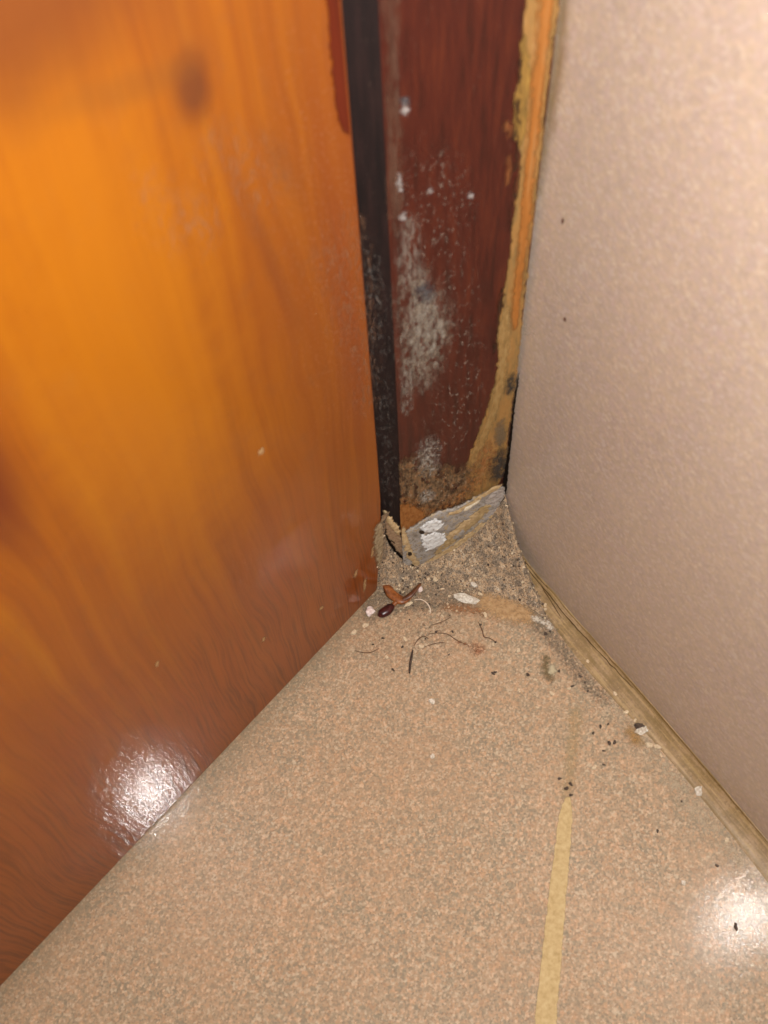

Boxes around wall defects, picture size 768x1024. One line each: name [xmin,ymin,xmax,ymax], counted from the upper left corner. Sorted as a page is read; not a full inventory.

damp [401,280,447,379]
peeling [376,0,560,636]